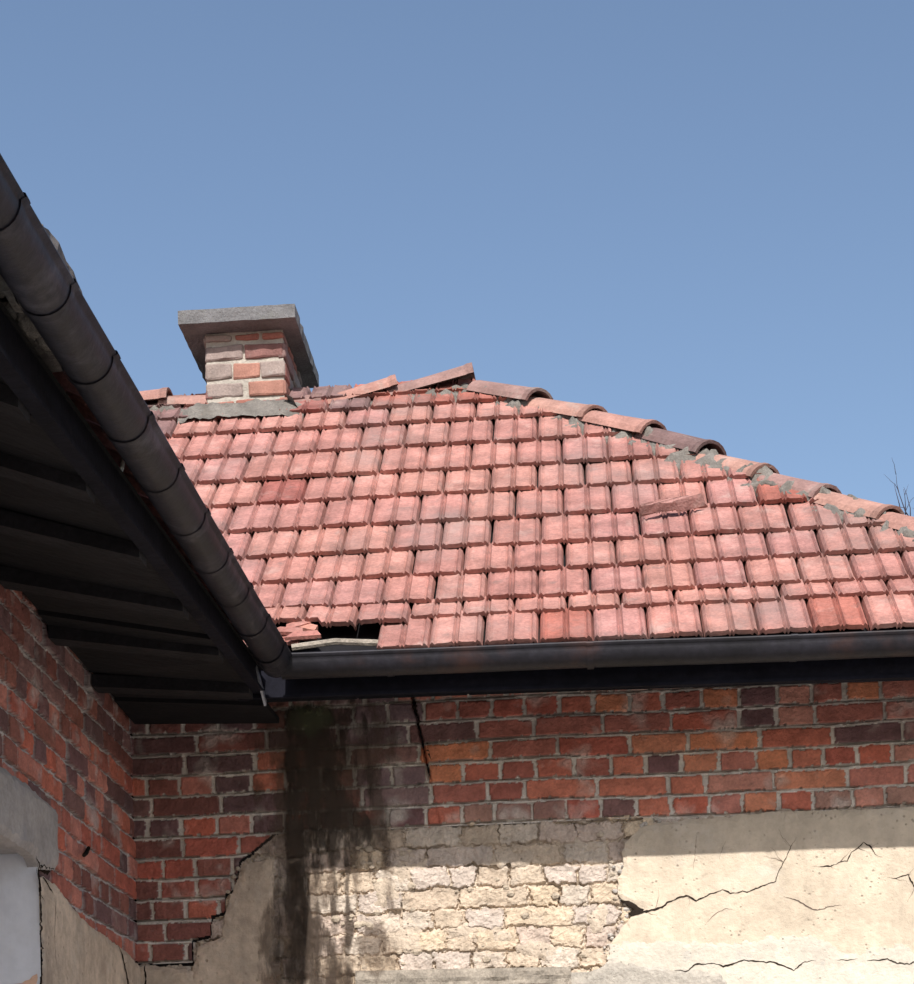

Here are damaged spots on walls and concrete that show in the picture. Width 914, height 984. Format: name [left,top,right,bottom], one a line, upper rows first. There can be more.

crack [412,697,431,759]
damp [274,699,371,984]
flaking render [171,815,661,984]
crack [620,830,838,919]
crack [813,842,876,869]
crack [120,950,147,984]
crack [677,960,814,972]
crack [840,957,914,965]